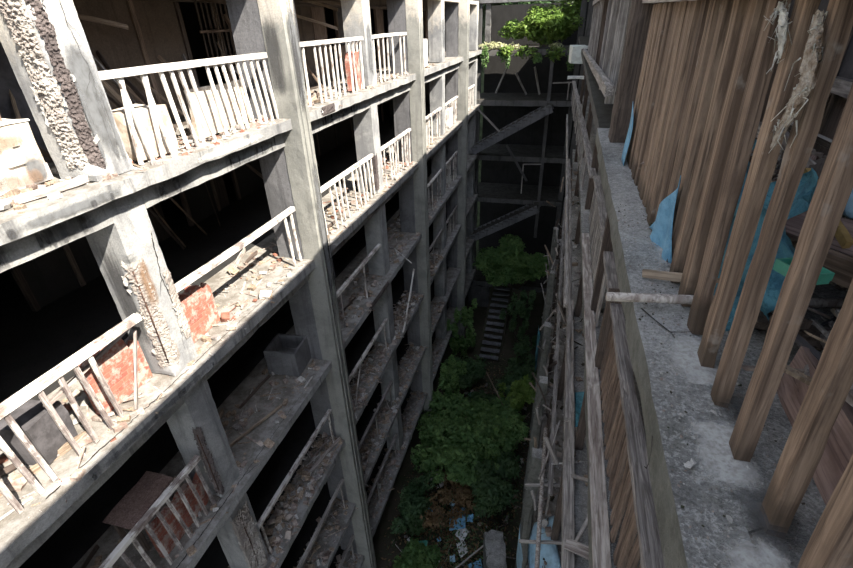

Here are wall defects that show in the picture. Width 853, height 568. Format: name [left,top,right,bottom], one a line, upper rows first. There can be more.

spalling [0,0,106,171]
spalling [120,258,191,369]
spalling [192,427,224,495]